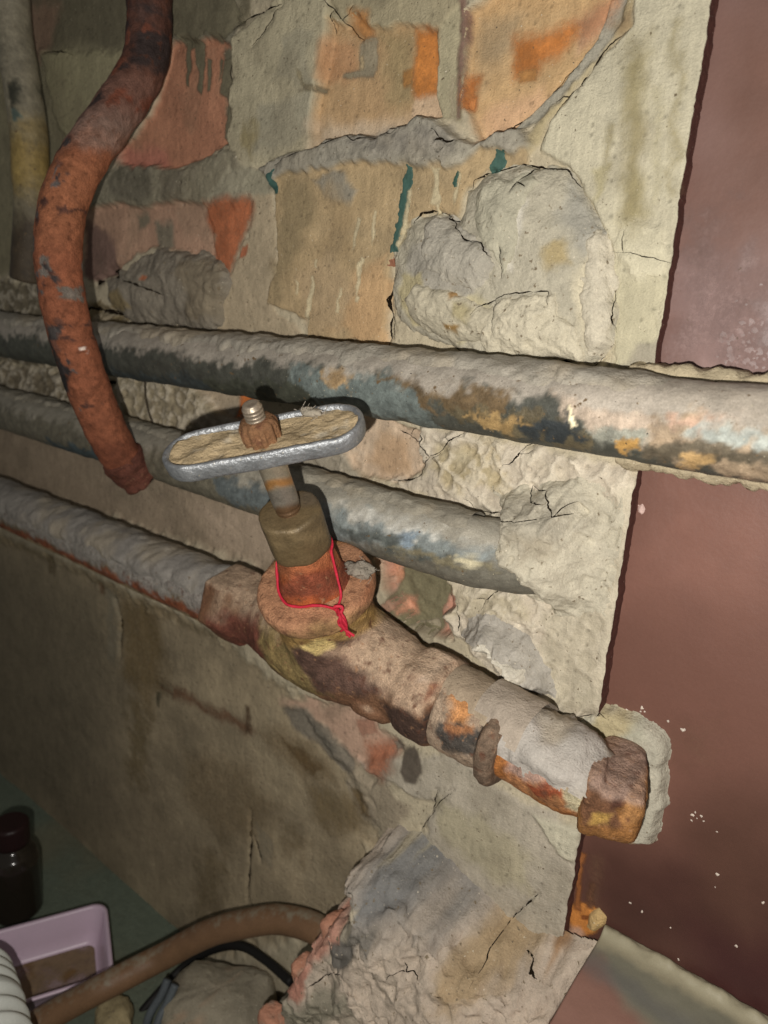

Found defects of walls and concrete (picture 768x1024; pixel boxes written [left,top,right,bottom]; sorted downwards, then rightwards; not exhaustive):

flaking render [403,32,439,97]
flaking render [515,27,575,82]
flaking render [460,78,480,110]
peeling [266,169,278,194]
peeling [489,149,510,175]
flaking render [207,198,253,270]
peeling [387,164,413,267]
crack [398,428,464,481]
crack [465,486,578,523]
corrosion [569,853,595,937]
crack [471,893,539,985]